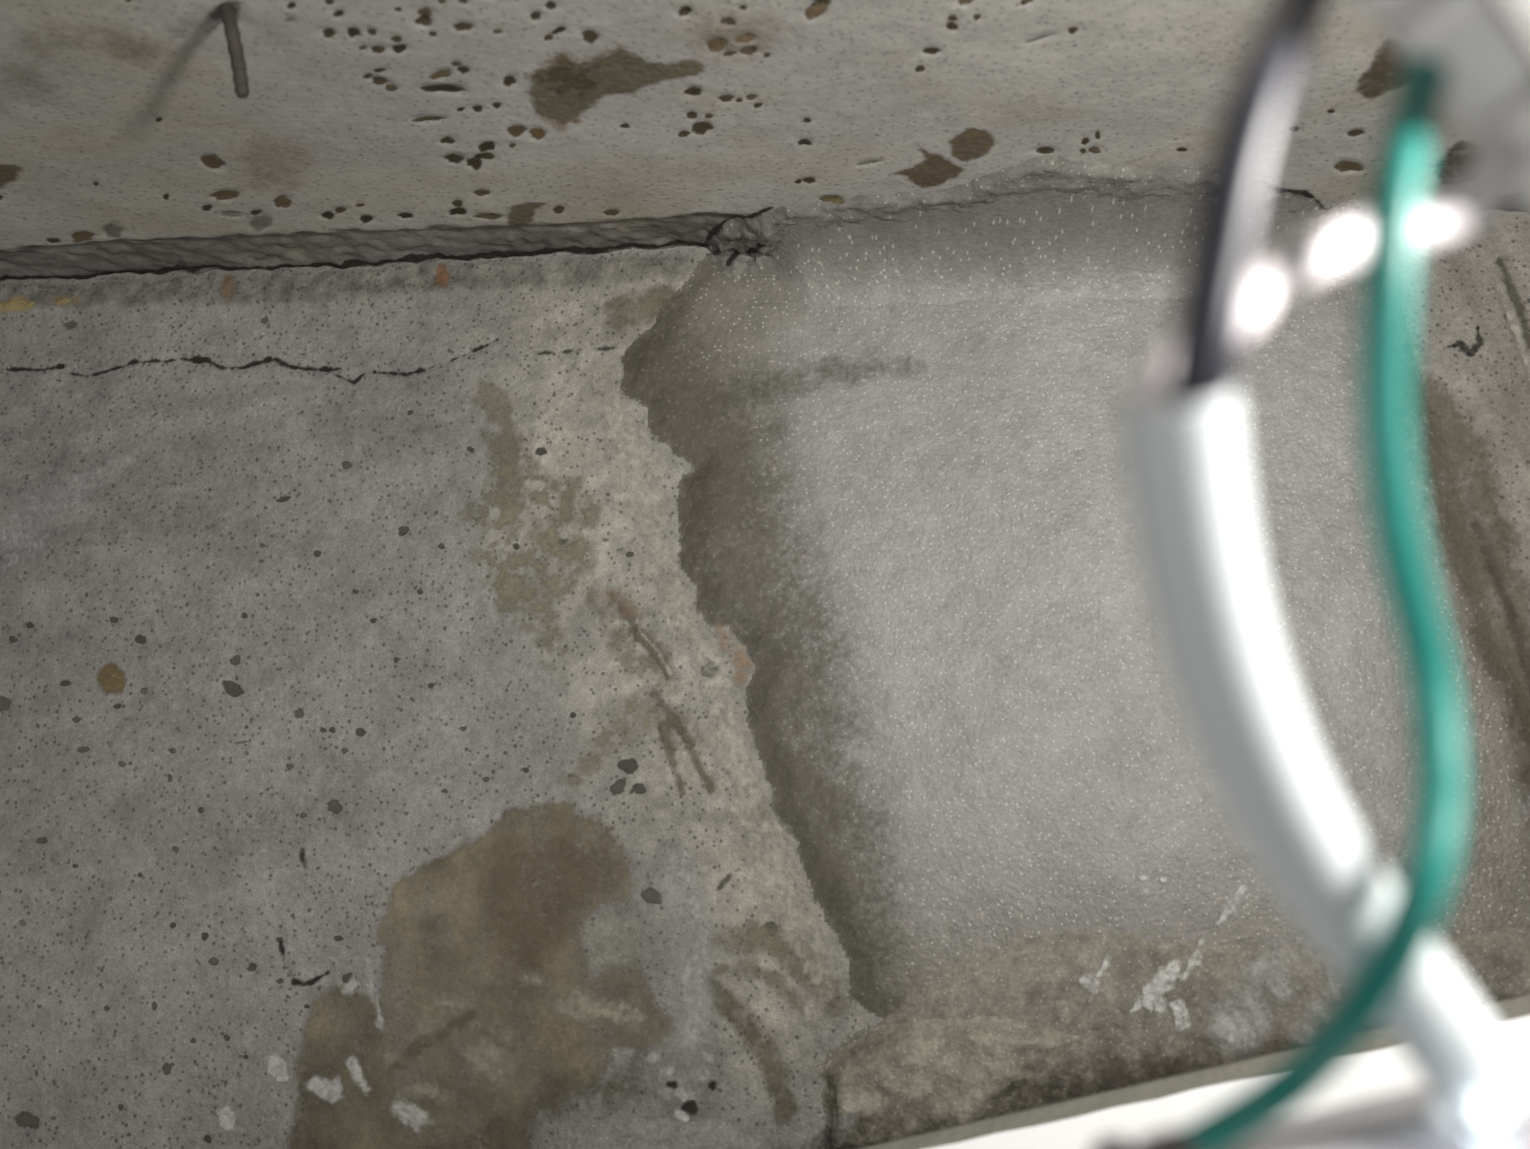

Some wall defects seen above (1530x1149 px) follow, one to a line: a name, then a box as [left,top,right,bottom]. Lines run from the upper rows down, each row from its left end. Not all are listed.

damp [0,165,20,187]
crack [0,207,773,280]
crack [8,339,613,384]
rust [98,664,126,693]
damp [291,803,680,1149]